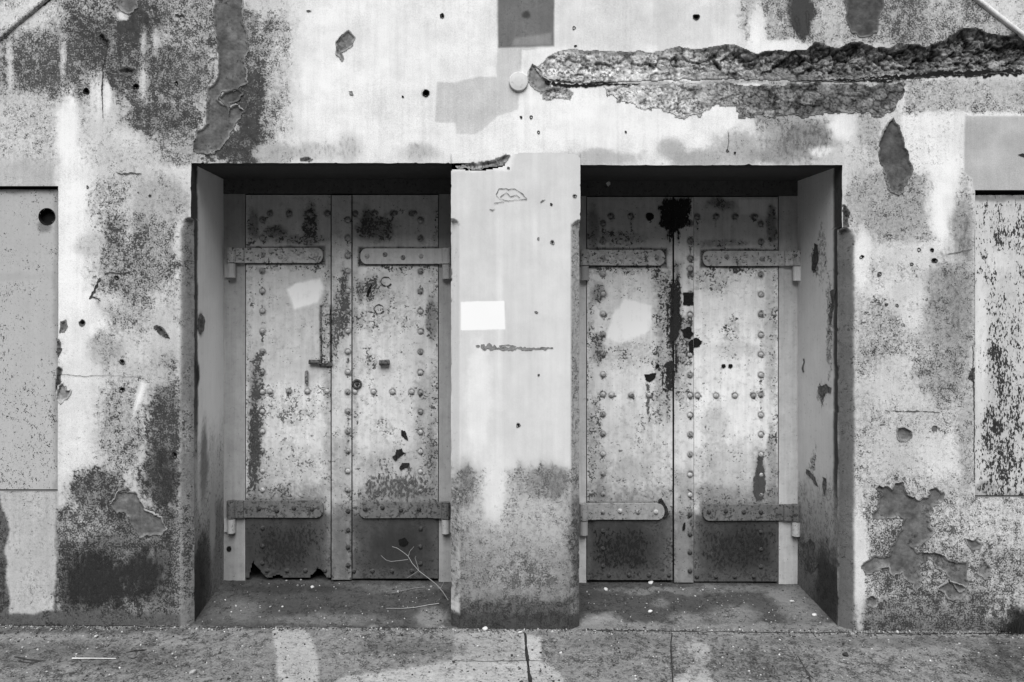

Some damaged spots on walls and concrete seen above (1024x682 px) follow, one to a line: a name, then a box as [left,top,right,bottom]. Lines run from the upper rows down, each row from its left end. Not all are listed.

peeling [335,30,355,61]
peeling [192,0,249,155]
spalling [527,0,1024,196]
spalling [455,154,510,170]
corrosion [646,196,692,250]
corrosion [644,271,702,421]
corrosion [247,405,262,491]
corrosion [752,453,766,500]
peeling [109,490,168,538]
peeling [861,480,991,601]
leakage [63,546,164,608]